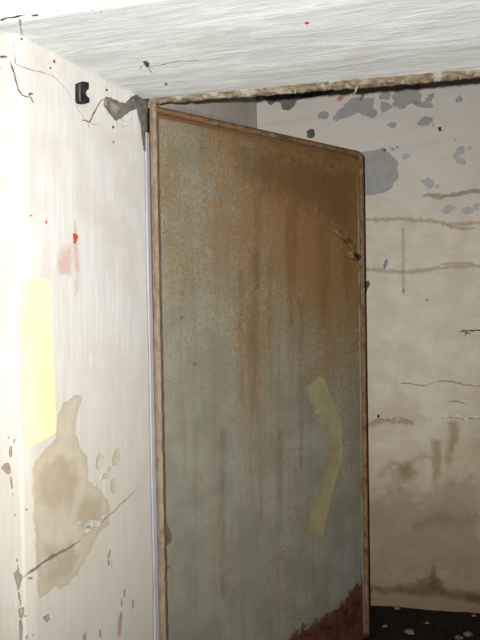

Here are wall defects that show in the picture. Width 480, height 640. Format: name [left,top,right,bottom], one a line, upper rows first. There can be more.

crack [0,14,103,127]
crack [139,56,232,74]
flaking render [104,95,148,152]
peeling [318,80,434,121]
peeling [361,147,409,196]
crack [401,379,480,387]
flaking render [1,436,15,489]
water stain [32,395,110,598]
flaking render [93,448,120,493]
crack [24,486,140,577]
flaking render [14,559,34,640]
corrosion [290,583,371,640]